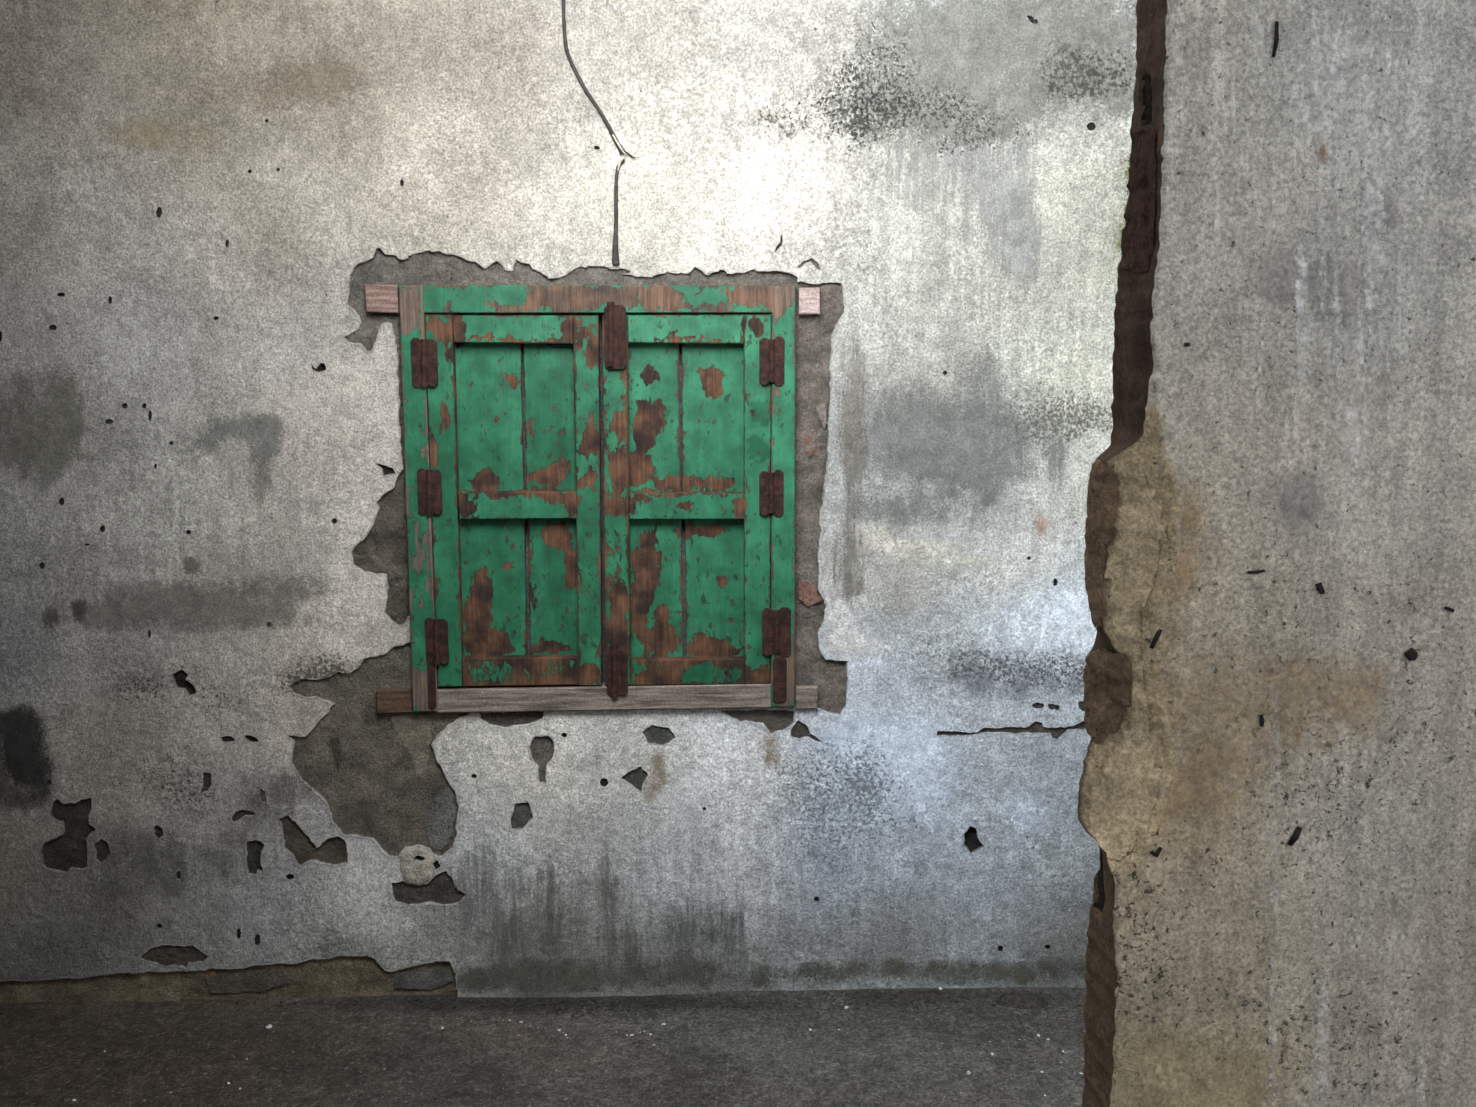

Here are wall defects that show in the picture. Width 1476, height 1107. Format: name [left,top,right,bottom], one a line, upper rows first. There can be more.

damp [753,0,1137,288]
flaking render [1118,129,1157,273]
flaking render [245,246,850,907]
flaking render [1082,458,1167,861]
damp [0,705,52,811]
flaking render [40,780,111,874]
flaking render [230,788,268,824]
flaking render [963,826,985,856]